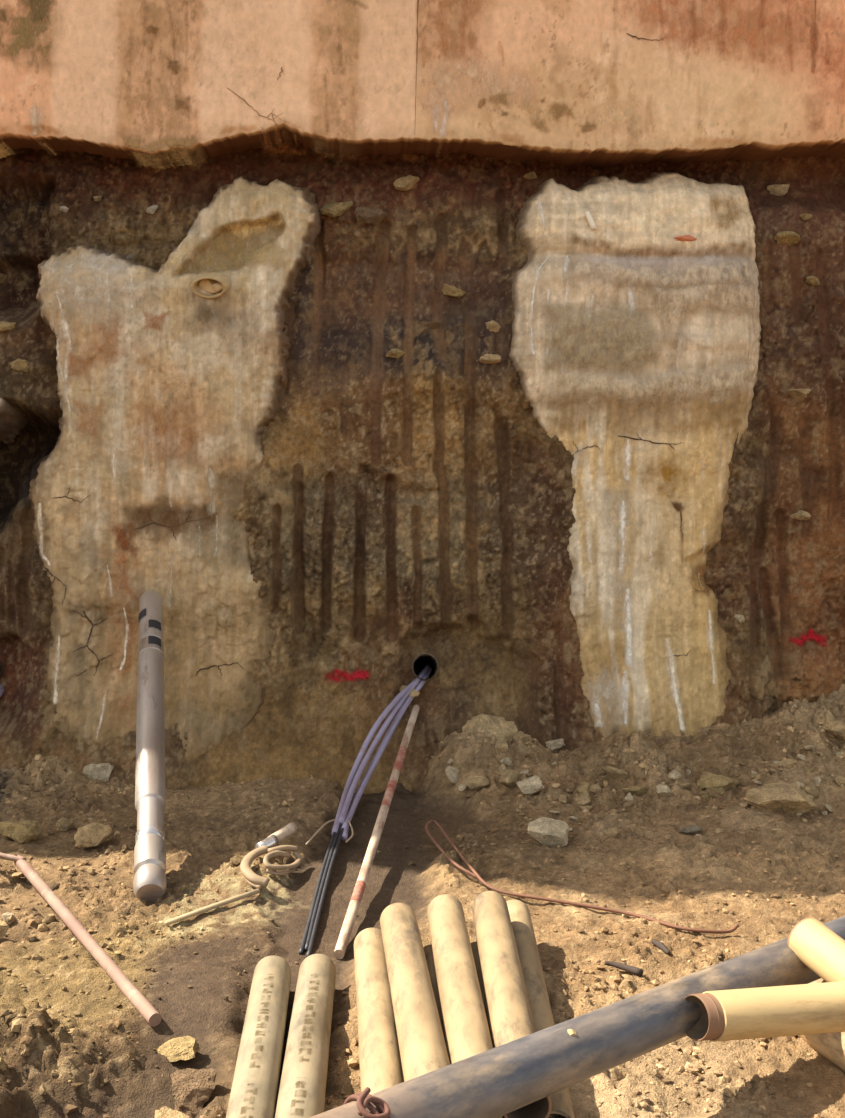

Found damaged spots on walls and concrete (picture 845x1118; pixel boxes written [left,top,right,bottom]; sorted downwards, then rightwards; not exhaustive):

corrosion [640,0,845,88]
crack [135,510,206,539]
crack [38,545,113,676]
crack [195,662,244,676]